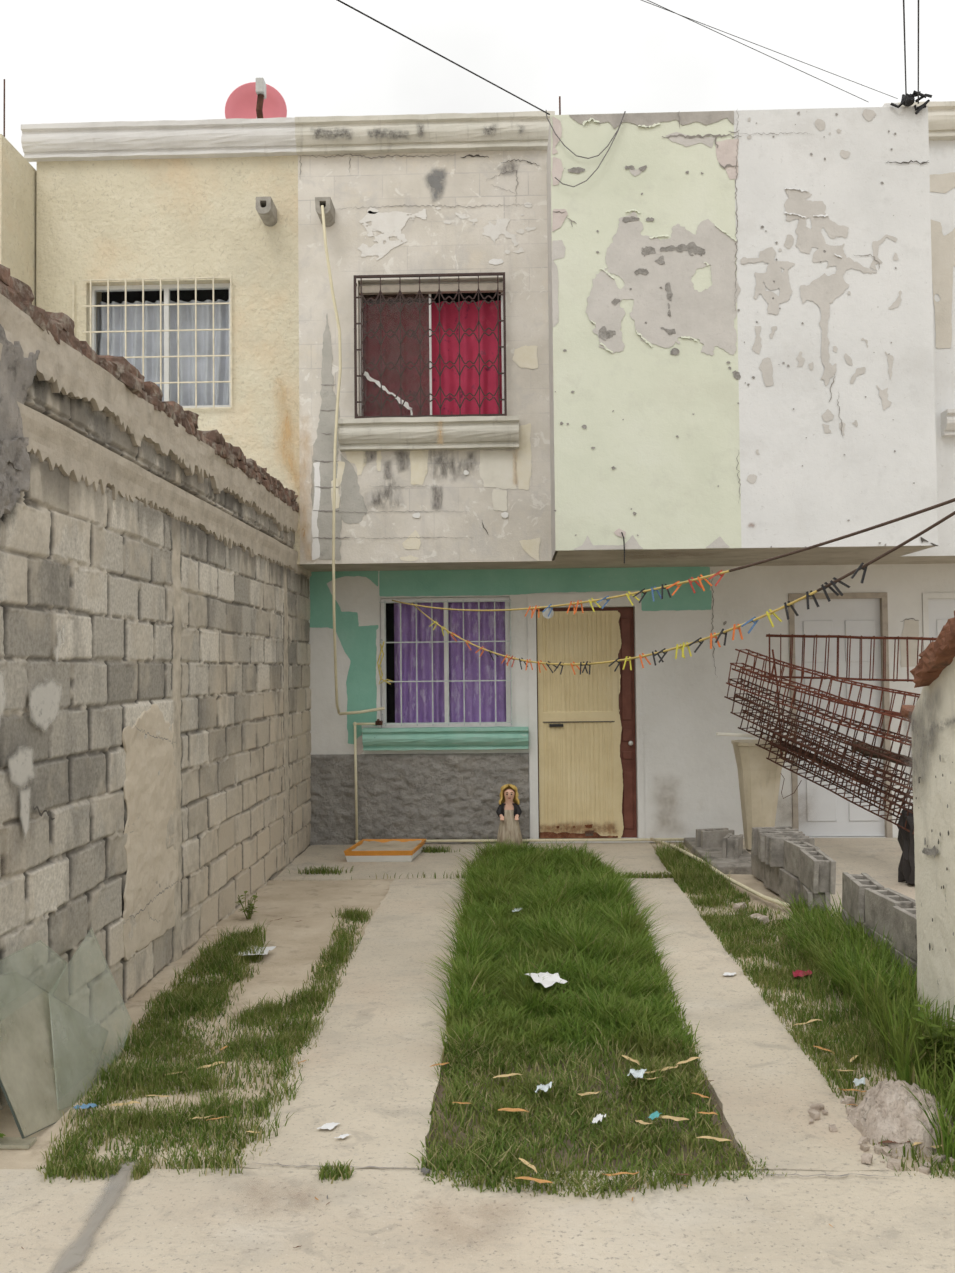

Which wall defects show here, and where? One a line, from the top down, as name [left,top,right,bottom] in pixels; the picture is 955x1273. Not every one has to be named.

water stain [315,129,351,139]
water stain [369,126,423,138]
water stain [427,170,444,199]
peeling [930,172,955,193]
peeling [358,207,427,260]
peeling [552,209,568,327]
peeling [586,187,899,394]
peeling [931,220,955,349]
peeling [861,338,894,420]